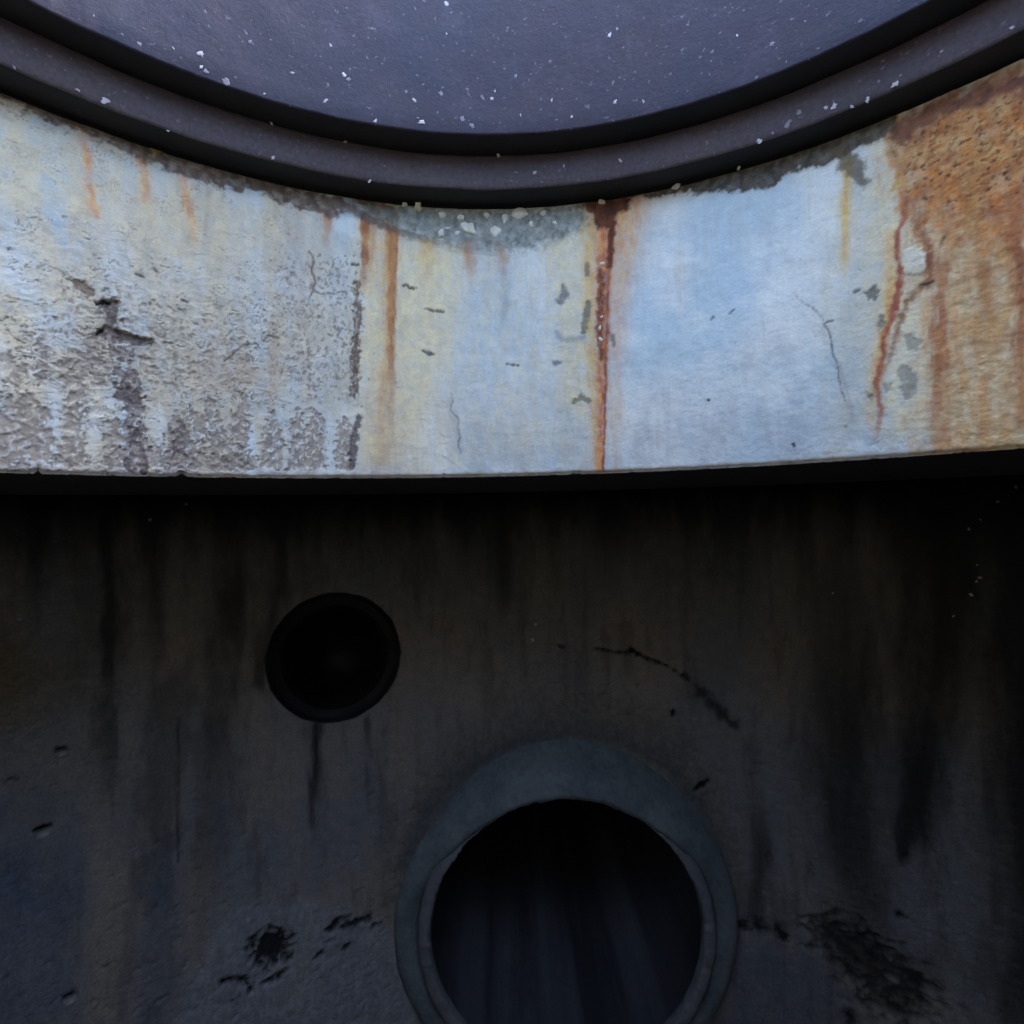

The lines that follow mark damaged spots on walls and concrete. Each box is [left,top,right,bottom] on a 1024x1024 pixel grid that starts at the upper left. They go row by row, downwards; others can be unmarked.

peeling [0,236,381,476]
damp [0,103,587,478]
rust [355,220,517,475]
rust [572,194,682,474]
damp [629,145,922,472]
crack [793,291,857,422]
rust [860,59,1024,457]
damp [0,474,1024,1024]
crack [592,645,746,736]
spalling [217,920,299,1007]
spalling [312,906,385,962]